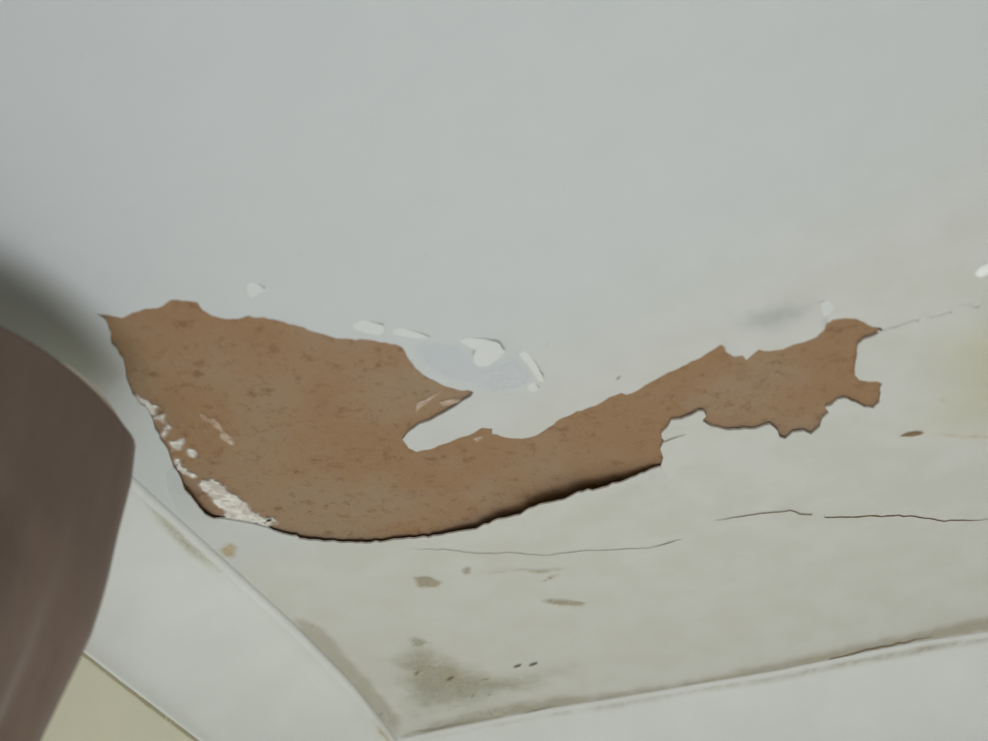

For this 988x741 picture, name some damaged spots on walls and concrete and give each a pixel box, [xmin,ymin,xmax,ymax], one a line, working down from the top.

peeling [100,300,882,542]
crack [716,510,988,522]